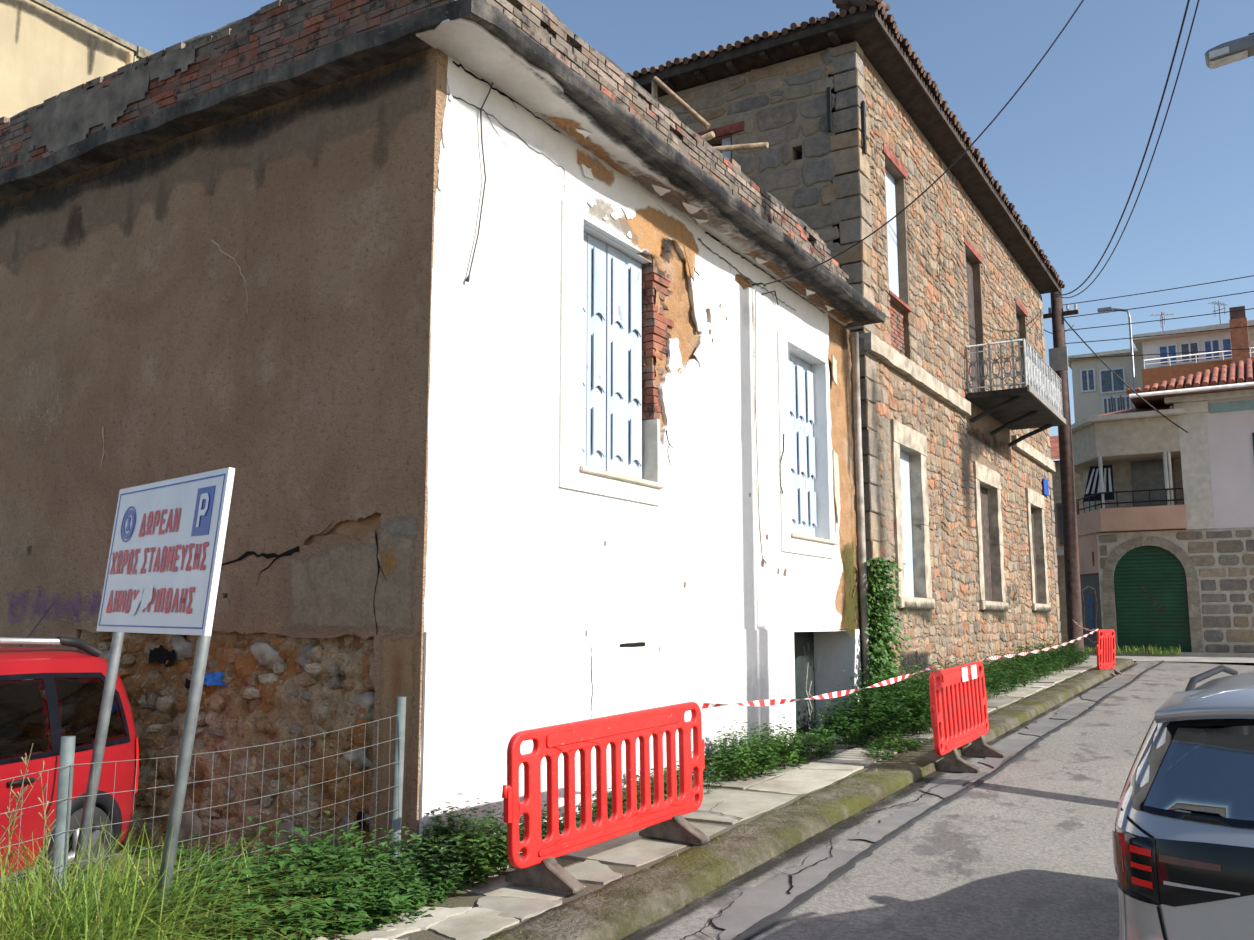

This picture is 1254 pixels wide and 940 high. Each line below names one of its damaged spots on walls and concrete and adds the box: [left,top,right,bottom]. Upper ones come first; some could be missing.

leakage [0,0,130,73]
leakage [0,69,427,272]
crack [447,61,566,197]
spalling [542,115,727,433]
spalling [735,274,750,289]
crack [221,546,299,583]
crack [373,531,387,635]
spalling [80,630,375,872]
crack [771,839,833,894]
crack [680,901,735,940]